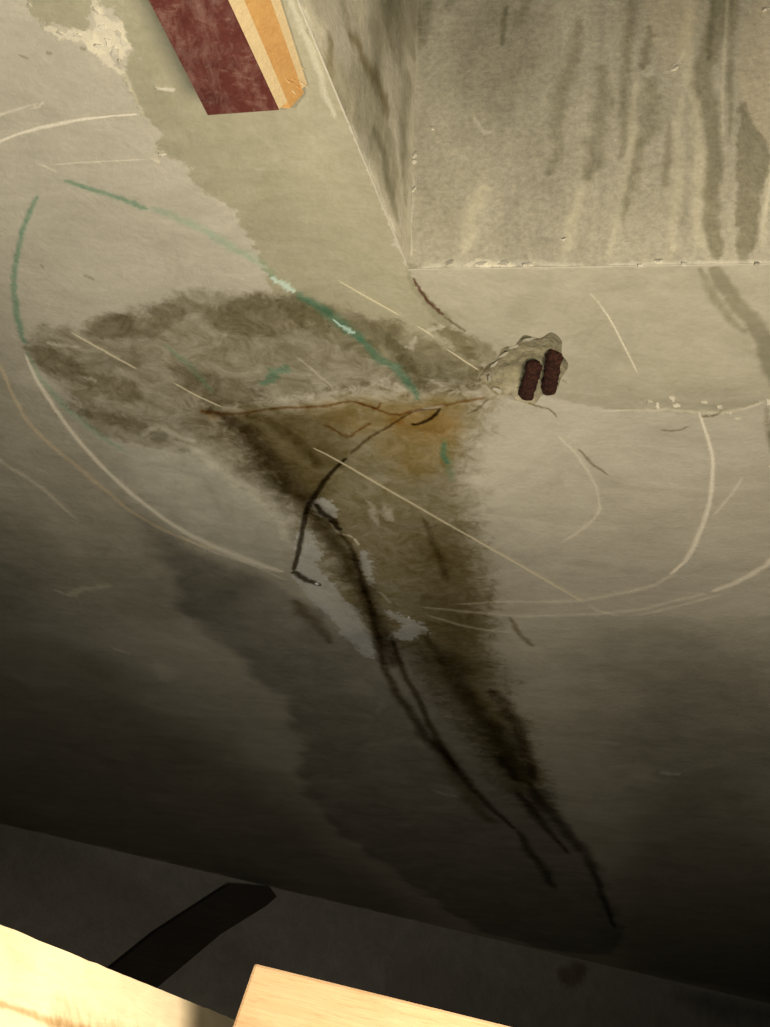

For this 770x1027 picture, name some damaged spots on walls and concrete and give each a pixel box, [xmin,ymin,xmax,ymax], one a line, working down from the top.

spalling [479,332,568,405]
crack [292,458,346,586]
damp [215,413,503,818]